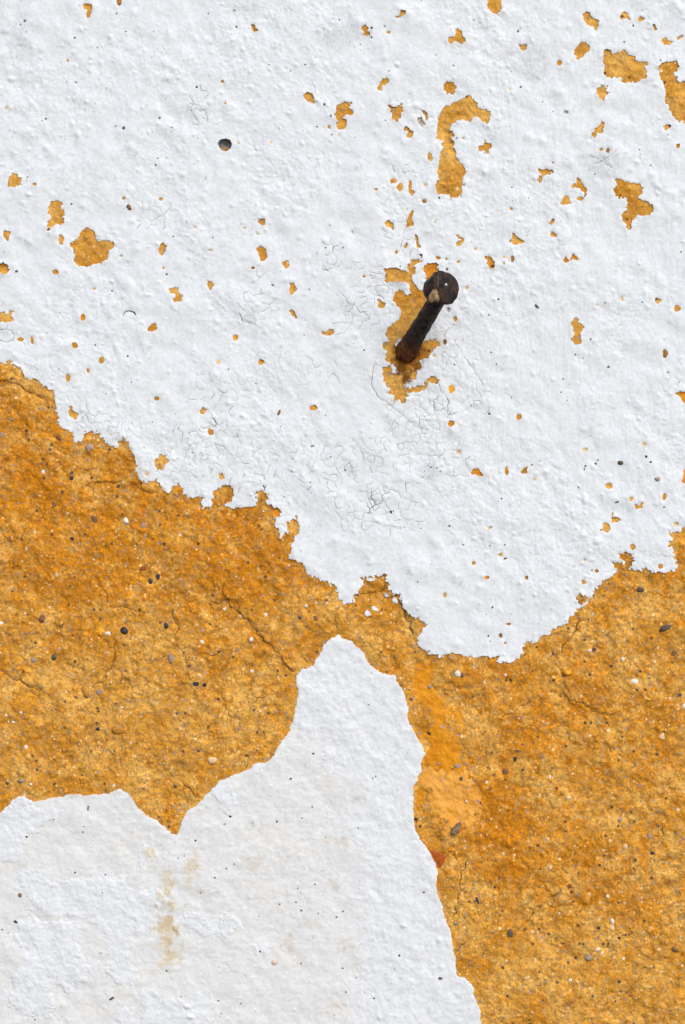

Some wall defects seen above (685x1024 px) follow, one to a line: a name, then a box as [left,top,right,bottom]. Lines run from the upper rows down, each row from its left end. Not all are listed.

peeling [47,200,122,267]
crack [74,240,490,543]
peeling [377,81,492,403]
peeling [613,178,653,230]
peeling [596,49,685,131]
peeling [0,360,685,1024]